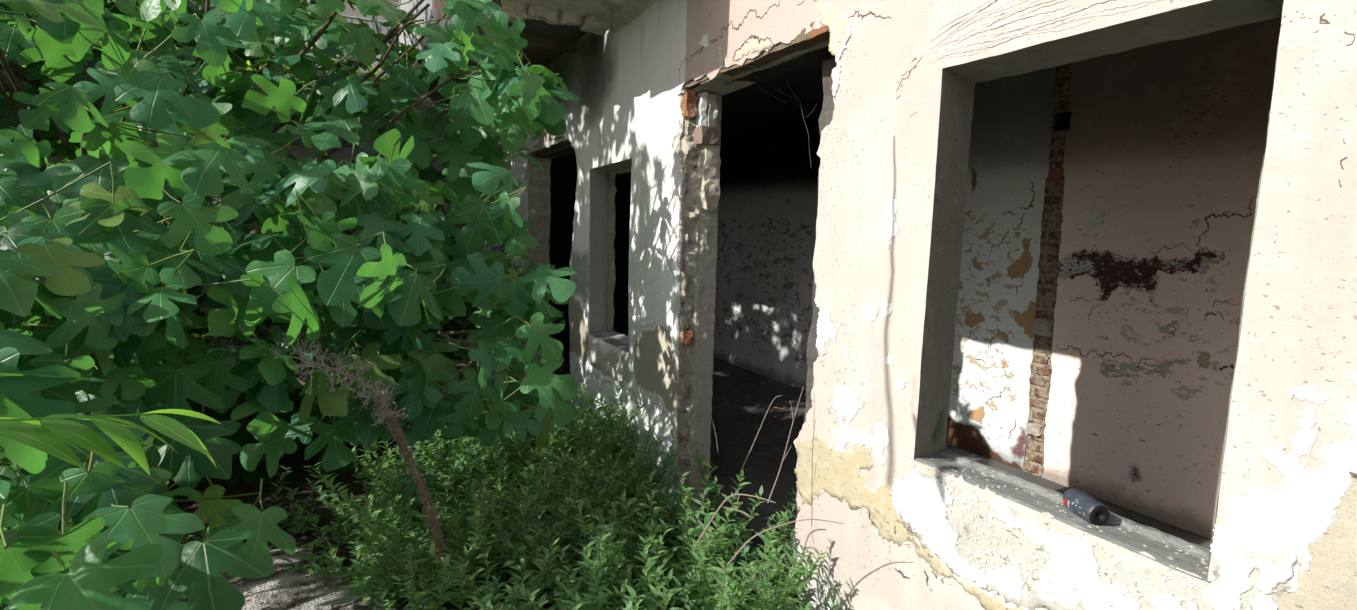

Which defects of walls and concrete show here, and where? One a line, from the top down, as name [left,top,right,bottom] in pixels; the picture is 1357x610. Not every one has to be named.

spalling [699,34,772,68]
crack [678,0,816,79]
spalling [819,5,852,97]
crack [848,9,891,20]
peeling [882,195,899,249]
spalling [951,63,1241,477]
spalling [568,261,678,414]
peeling [714,218,1357,610]